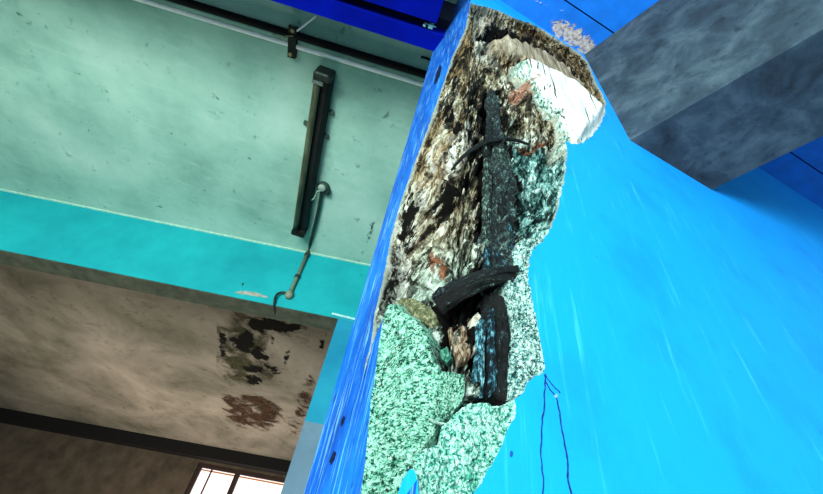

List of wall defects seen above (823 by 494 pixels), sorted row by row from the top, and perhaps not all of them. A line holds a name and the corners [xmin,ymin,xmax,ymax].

spalling [361,3,606,494]
water stain [217,312,307,385]
crack [540,374,572,494]